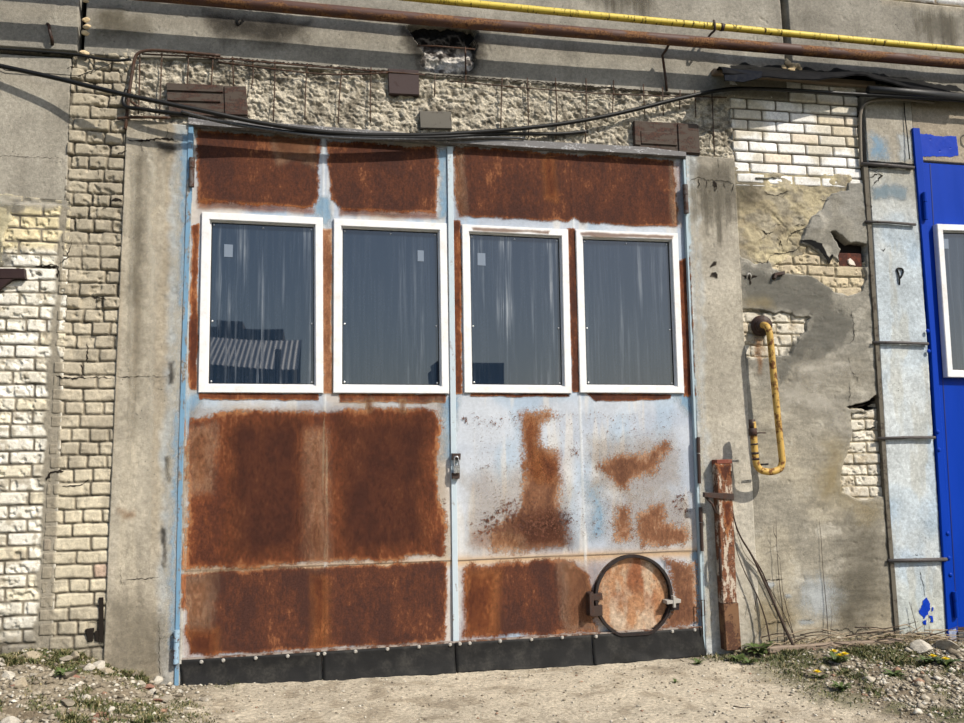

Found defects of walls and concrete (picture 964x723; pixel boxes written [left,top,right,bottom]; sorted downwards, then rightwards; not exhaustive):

rust [195,129,440,218]
spalling [117,28,865,296]
rust [181,146,679,656]
rust [596,440,700,628]
rust [679,257,696,397]
rust [715,463,731,485]
rust [722,500,733,540]
spalling [743,309,808,360]
spalling [840,404,882,500]
crack [847,313,876,438]